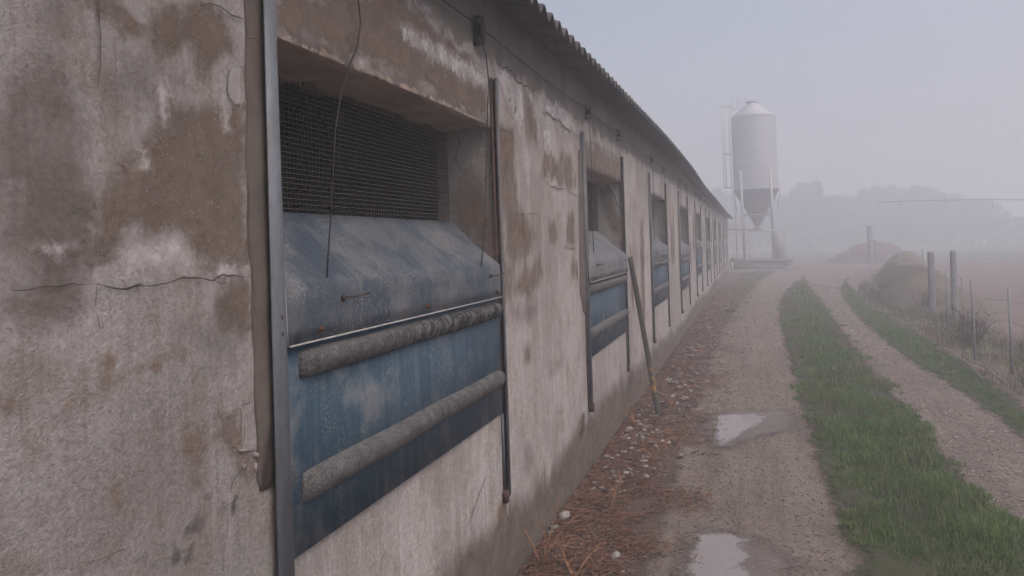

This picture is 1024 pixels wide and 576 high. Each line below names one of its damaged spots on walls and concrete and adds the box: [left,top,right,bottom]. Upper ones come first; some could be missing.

crack [95,0,103,85]
leakage [3,78,251,331]
crack [9,139,255,332]
leakage [153,3,232,71]
leakage [276,0,578,297]
crack [455,58,619,181]
leakage [454,269,729,576]